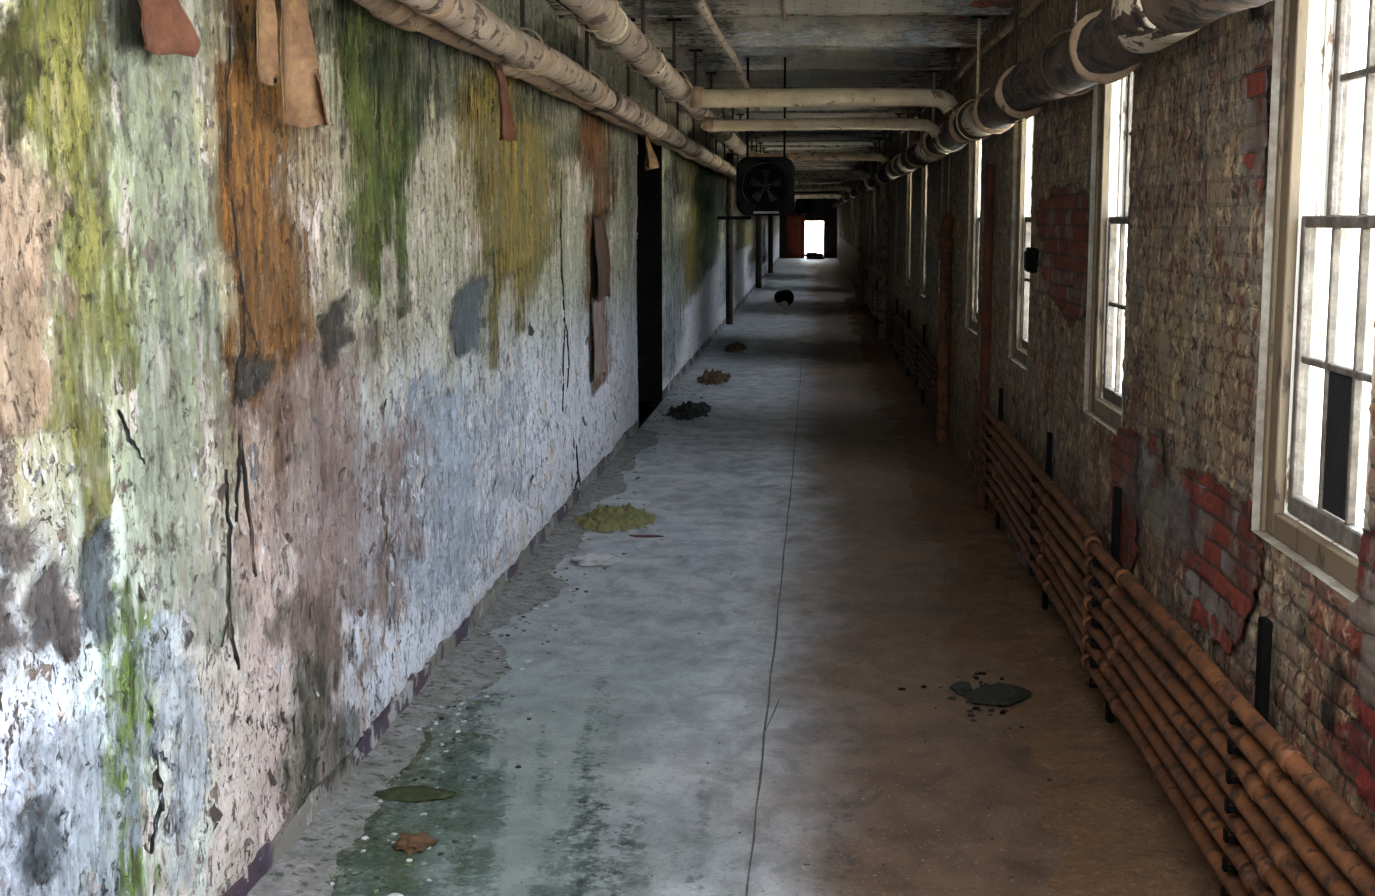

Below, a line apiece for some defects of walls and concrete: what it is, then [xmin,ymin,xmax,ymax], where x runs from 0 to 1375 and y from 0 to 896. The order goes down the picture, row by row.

rust [210,0,335,473]
flaking render [1032,141,1089,332]
crack [220,27,260,670]
peeling [22,441,60,485]
peeling [190,435,248,535]
peeling [138,532,171,620]
peeling [148,601,211,652]
crack [745,326,805,896]
flaking render [1321,508,1375,820]
flaking render [1,772,68,889]
crack [145,695,182,854]
peeling [210,804,223,832]